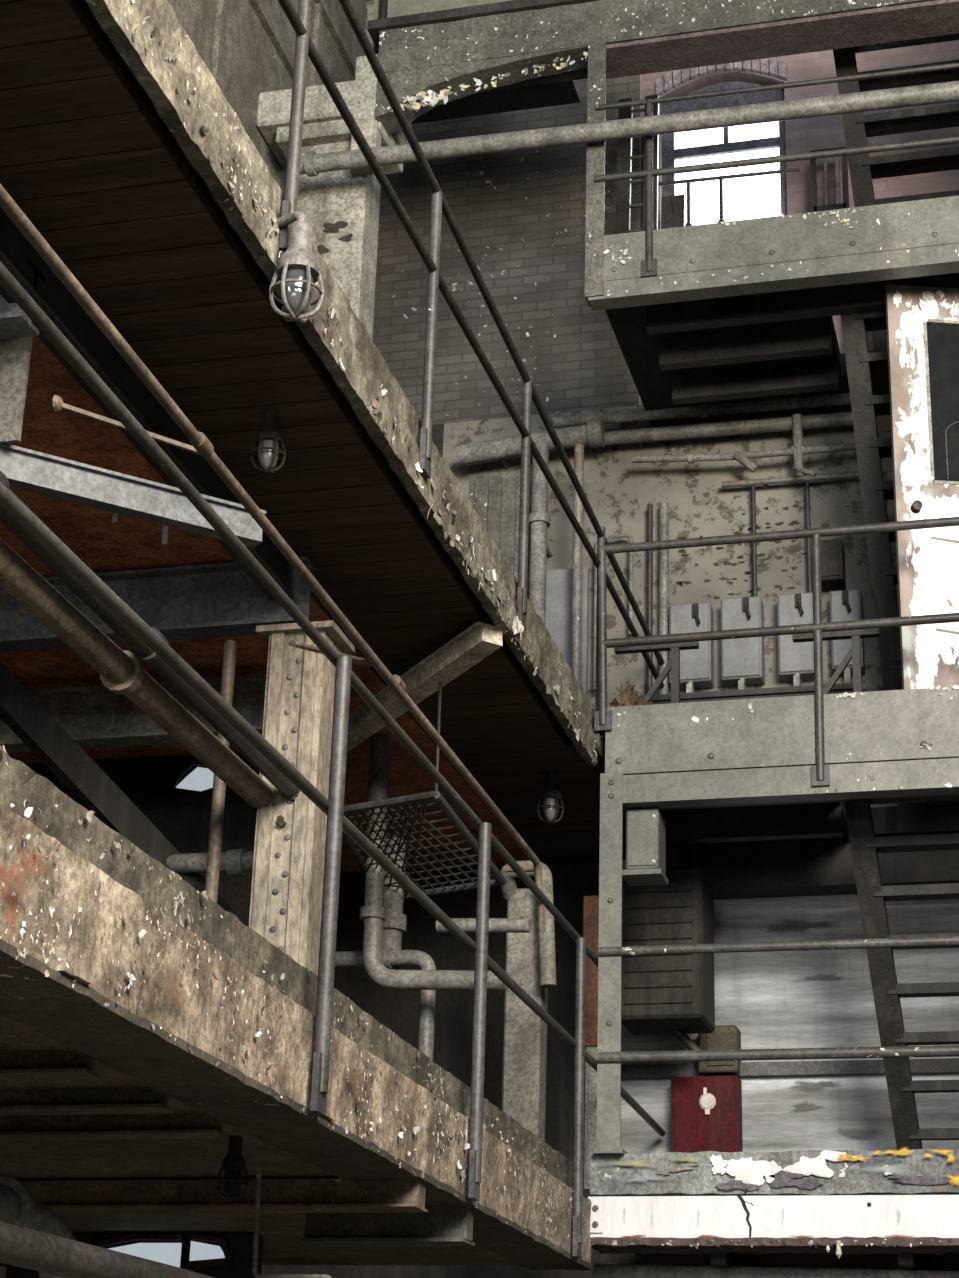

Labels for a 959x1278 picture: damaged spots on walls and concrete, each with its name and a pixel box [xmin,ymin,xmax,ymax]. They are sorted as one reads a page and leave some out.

peeling [401,14,588,111]
spalling [657,1150,959,1191]
crack [737,1188,754,1237]